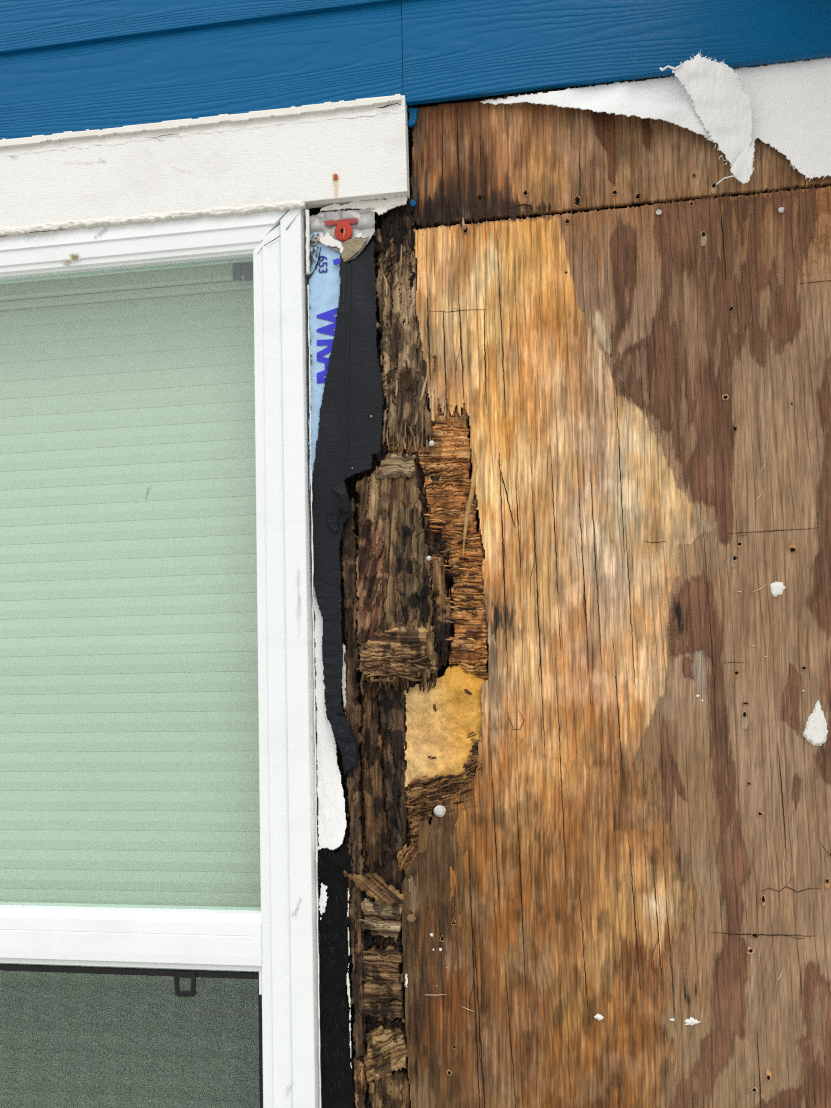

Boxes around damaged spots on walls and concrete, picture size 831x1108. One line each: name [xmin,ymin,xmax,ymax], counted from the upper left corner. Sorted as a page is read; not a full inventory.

peeling [375,453,417,480]
damp [809,359,831,639]
peeling [351,517,437,695]
damp [401,187,816,1108]
damp [816,656,831,784]
peeling [397,840,419,877]
damp [756,961,831,1108]